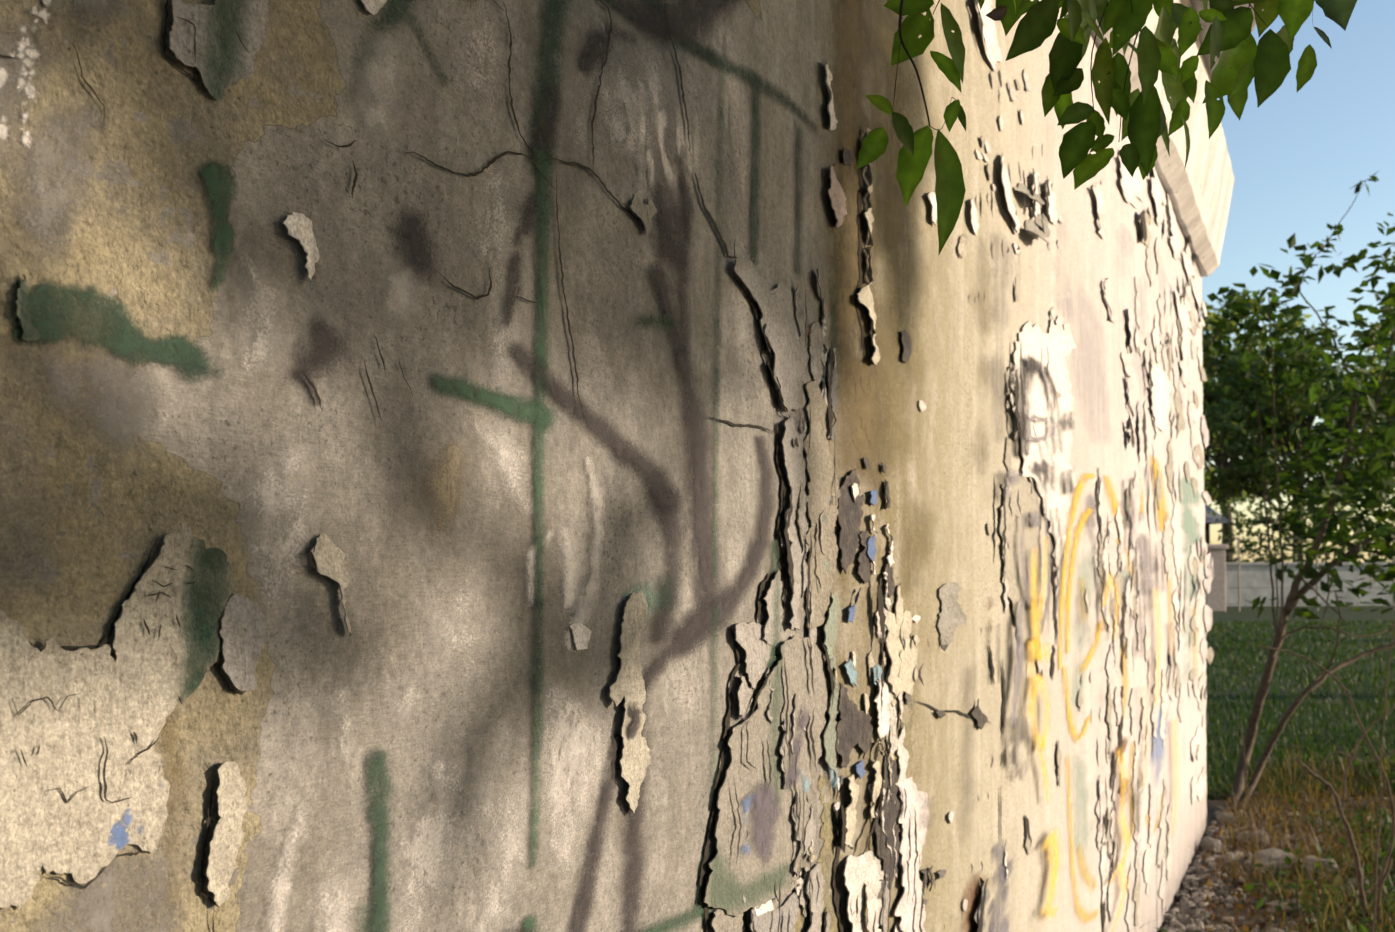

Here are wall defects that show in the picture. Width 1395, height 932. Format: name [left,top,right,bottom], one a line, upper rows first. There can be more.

crack [324,139,358,198]
peeling [360,0,387,15]
crack [405,0,639,429]
crack [664,0,737,258]
spalling [0,0,352,932]
peeling [699,258,947,932]
peeling [937,582,967,651]
peeling [970,699,988,730]
peeling [986,306,1077,685]
peeling [1077,154,1214,932]
peeling [961,862,990,932]